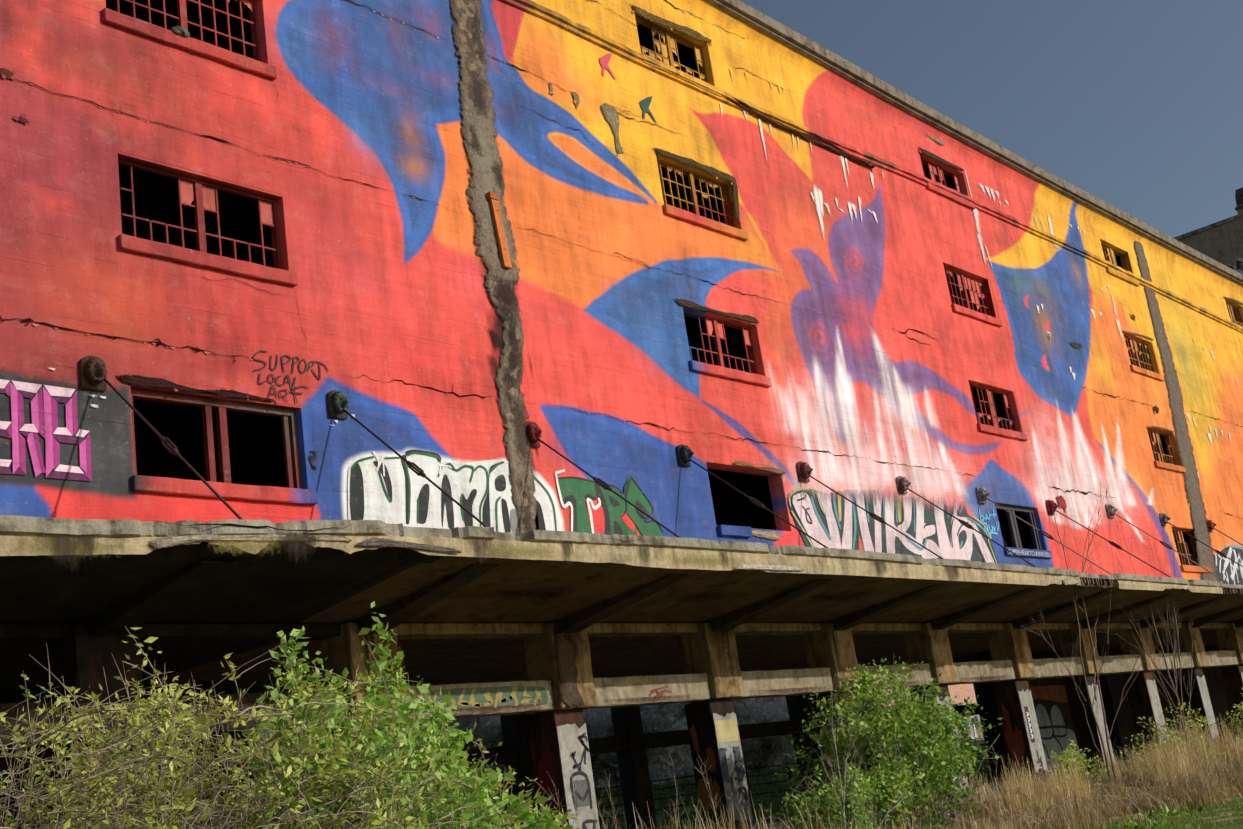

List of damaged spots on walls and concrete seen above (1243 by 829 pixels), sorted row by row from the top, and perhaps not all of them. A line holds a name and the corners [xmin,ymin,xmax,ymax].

crack [15,79,440,204]
peeling [450,0,537,534]
crack [0,316,262,362]
crack [351,374,495,398]